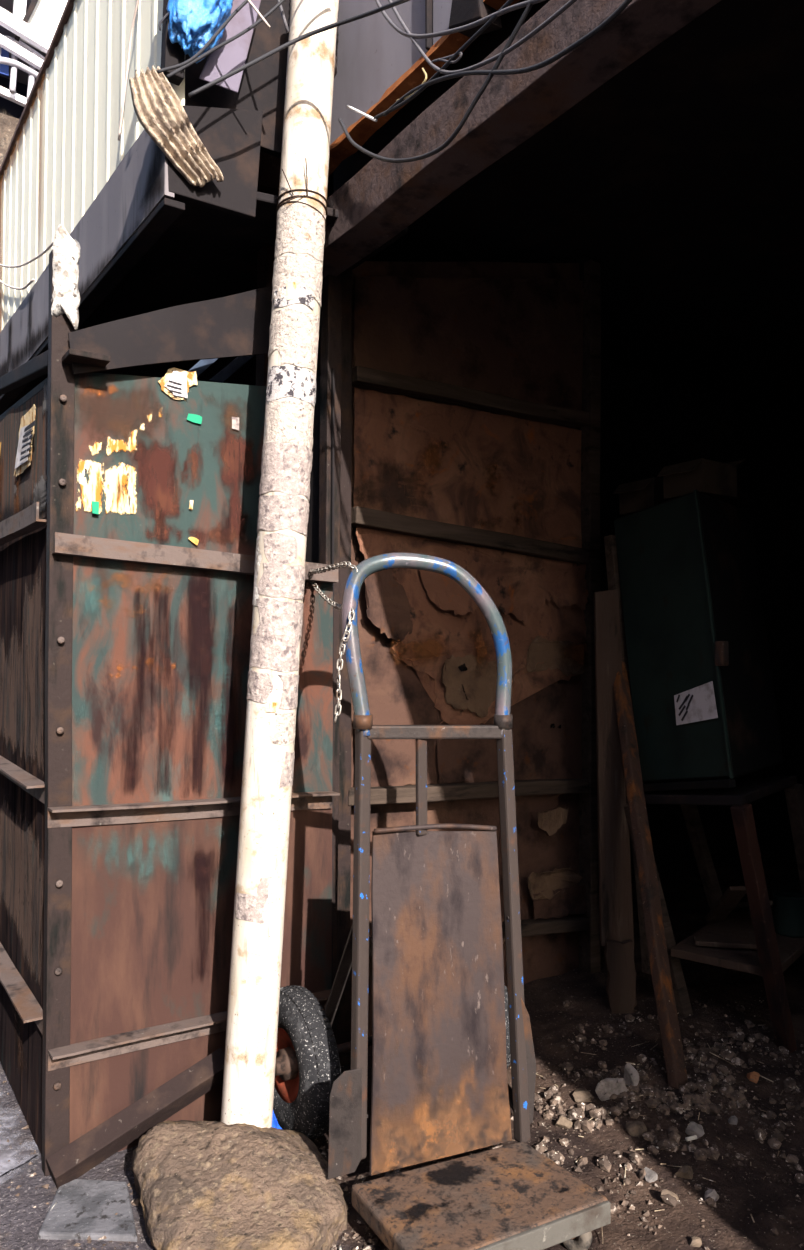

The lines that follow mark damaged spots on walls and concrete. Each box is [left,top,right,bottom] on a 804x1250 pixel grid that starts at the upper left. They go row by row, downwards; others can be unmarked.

rust [75,386,257,543]
rust [113,574,171,790]
rust [188,574,239,794]
peeling [356,526,589,725]